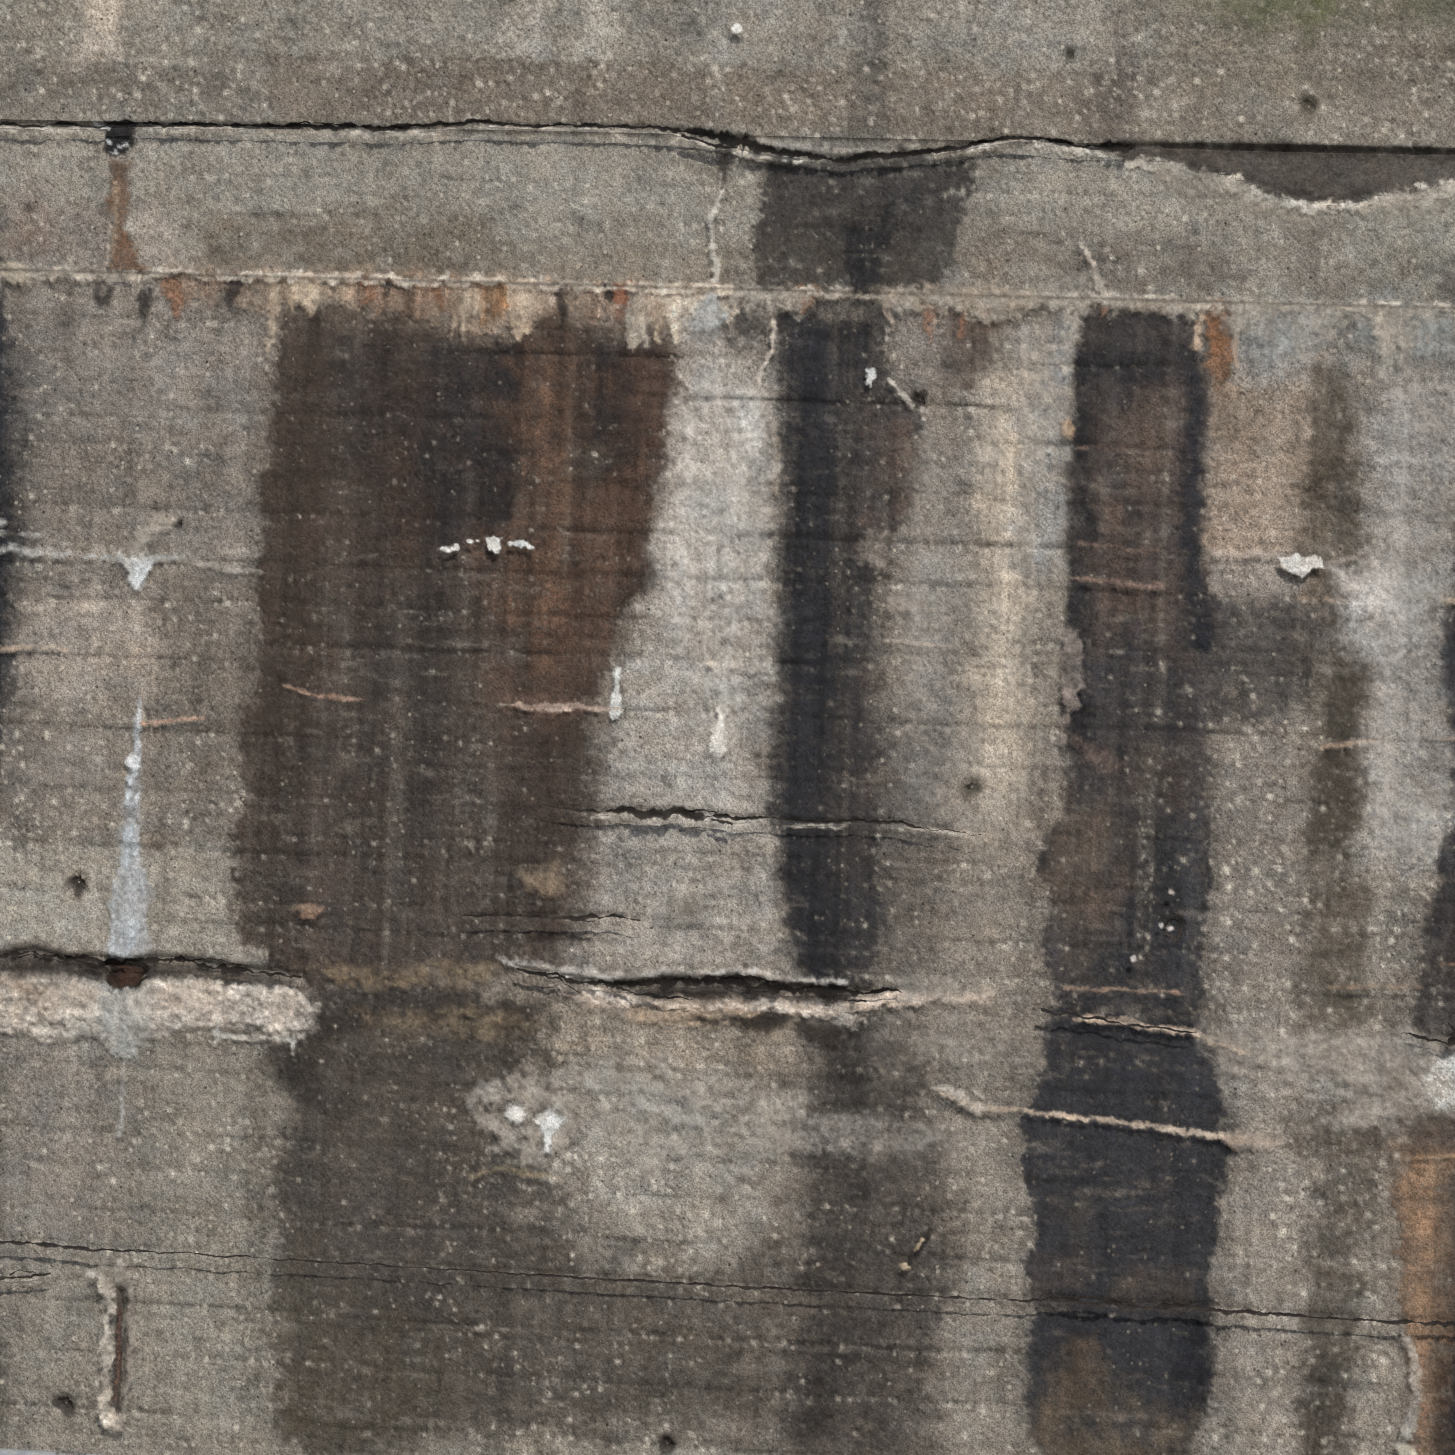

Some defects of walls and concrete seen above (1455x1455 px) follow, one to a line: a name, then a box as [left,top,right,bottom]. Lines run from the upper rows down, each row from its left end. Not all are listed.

crack [0,118,1129,164]
spalling [1032,135,1455,219]
water stain [0,262,204,289]
water stain [216,270,518,288]
rust [94,159,738,351]
rust [1194,299,1238,389]
water stain [527,145,1455,1455]
water stain [0,301,992,1455]
crack [0,940,301,983]
crack [516,967,902,1003]
rust [113,1308,123,1400]